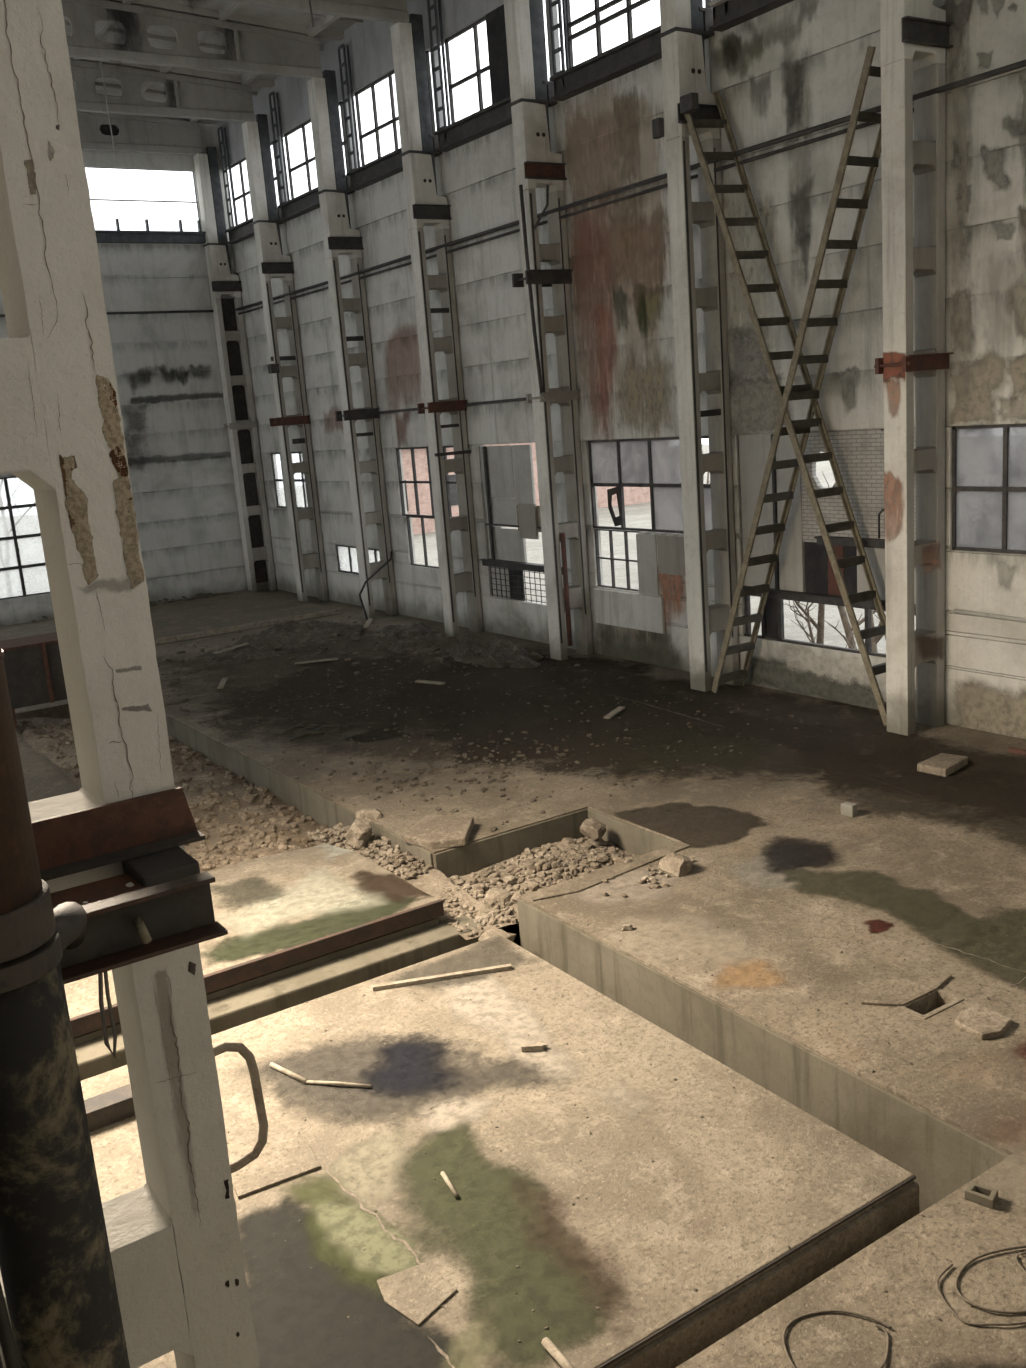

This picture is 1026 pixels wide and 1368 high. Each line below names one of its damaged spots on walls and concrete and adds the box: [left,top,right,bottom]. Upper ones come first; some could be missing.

water stain [713,34,768,113]
crack [4,0,97,375]
water stain [783,57,811,238]
water stain [129,365,223,404]
water stain [839,367,859,409]
rust [883,352,905,416]
peeling [949,290,1026,424]
spalling [59,455,98,585]
spalling [96,375,144,589]
rust [884,472,902,536]
rust [658,570,684,622]
crack [151,969,201,1223]